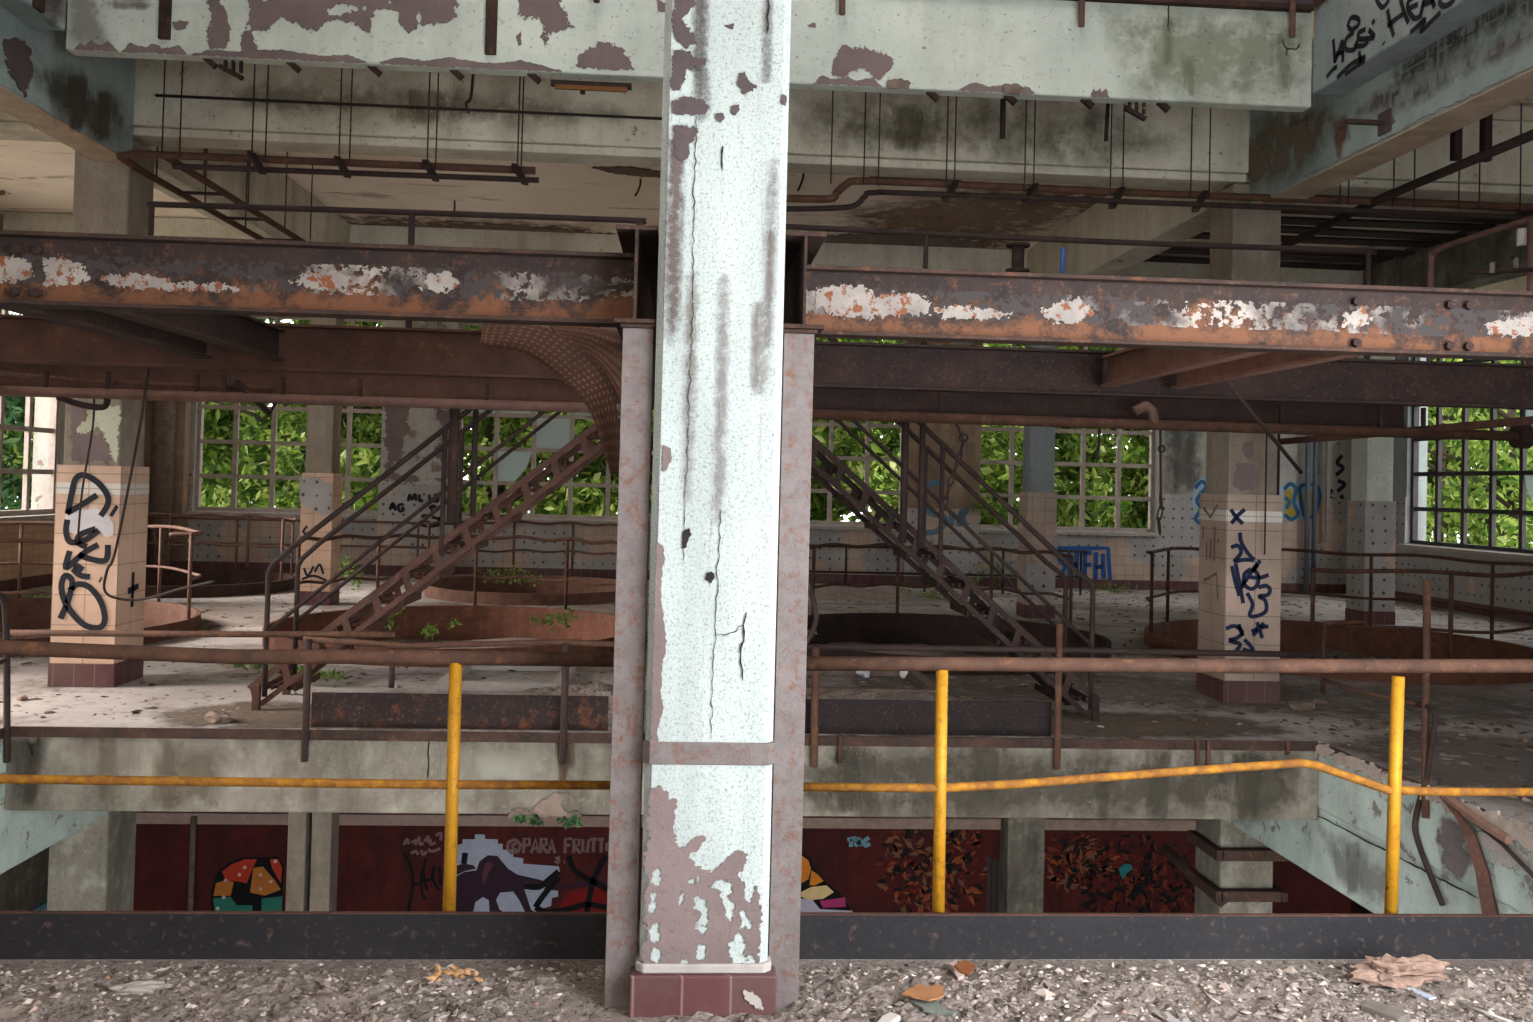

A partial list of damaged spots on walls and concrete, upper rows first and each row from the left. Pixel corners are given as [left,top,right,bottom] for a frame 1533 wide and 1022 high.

peeling [2,37,34,98]
leakage [44,73,123,138]
peeling [75,0,635,72]
peeling [813,44,911,89]
peeling [958,82,1035,95]
peeling [592,0,757,333]
peeling [640,785,763,973]